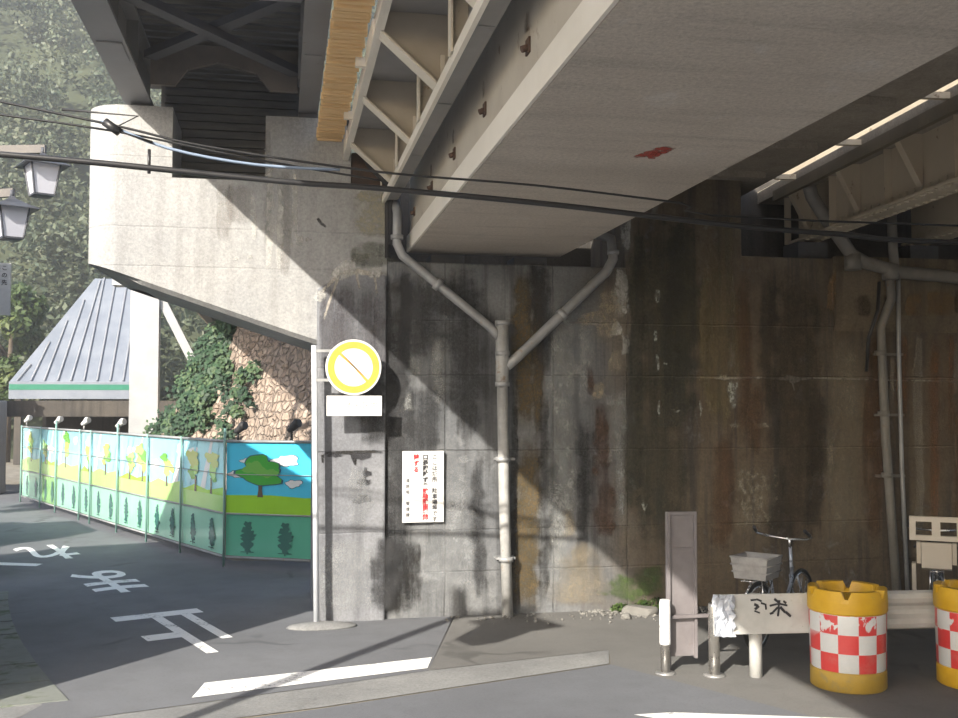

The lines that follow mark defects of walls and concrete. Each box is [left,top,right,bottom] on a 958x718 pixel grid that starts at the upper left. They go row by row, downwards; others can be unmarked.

water stain [320,272,491,613]
water stain [625,225,699,539]